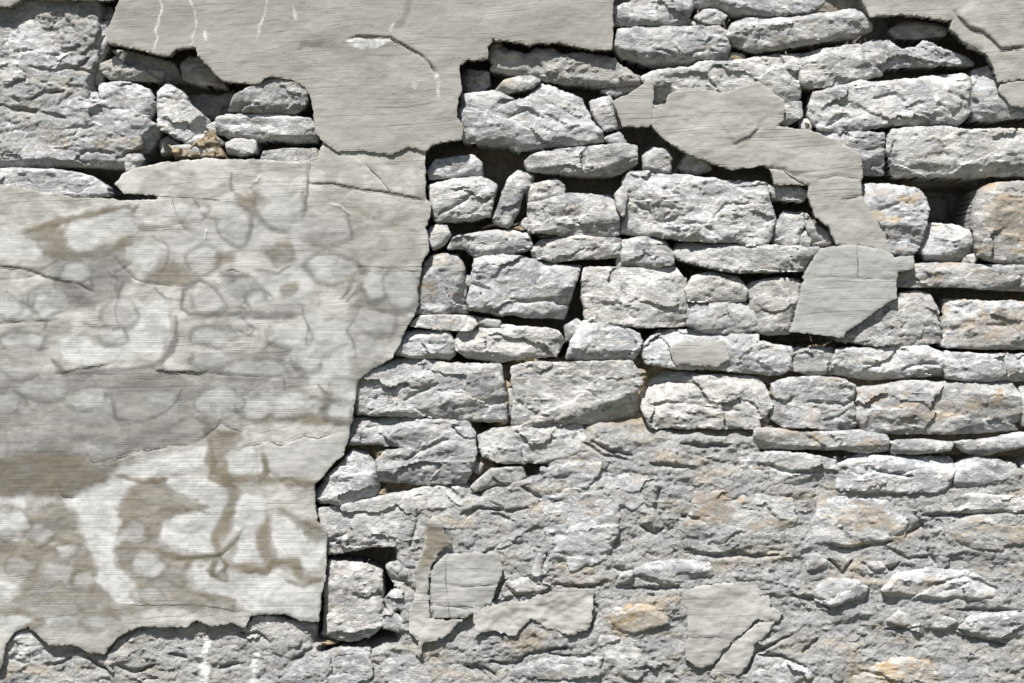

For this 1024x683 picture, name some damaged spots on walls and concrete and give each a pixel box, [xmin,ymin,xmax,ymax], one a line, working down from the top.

crack [357,35,434,69]
flaking render [860,0,1024,109]
crack [304,162,423,215]
flaking render [612,77,915,338]
crack [0,265,91,290]
crack [154,370,278,378]
flaking render [0,0,614,669]
flaking render [669,339,729,367]
leakage [0,496,29,542]
leakage [48,440,326,618]
leakage [0,580,19,602]
flaking render [682,581,783,678]